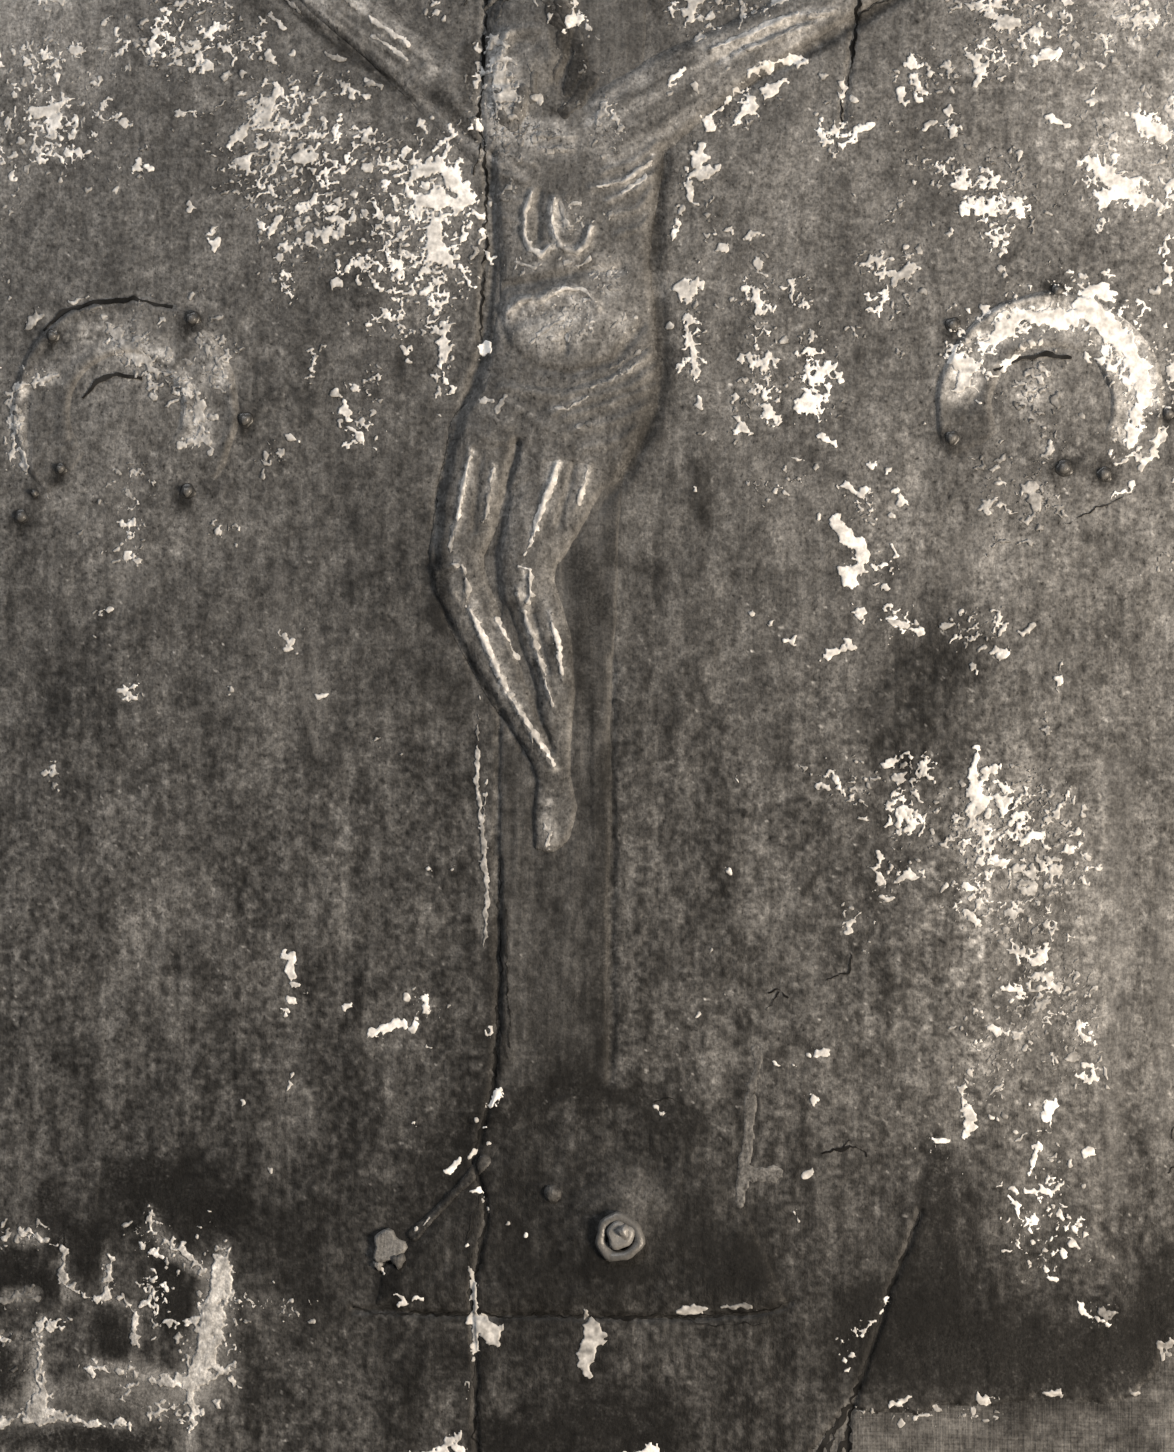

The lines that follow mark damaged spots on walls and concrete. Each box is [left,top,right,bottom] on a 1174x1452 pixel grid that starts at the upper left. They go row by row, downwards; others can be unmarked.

peeling [68,295,245,456]
peeling [0,0,655,429]
peeling [330,364,388,451]
crack [462,0,490,340]
crack [841,0,889,129]
peeling [663,0,1174,557]
peeling [799,745,1116,1282]
peeling [443,1087,504,1175]
flaking render [0,1204,318,1434]
peeling [409,1430,466,1452]
peeling [835,1296,889,1372]
crack [816,1212,920,1452]